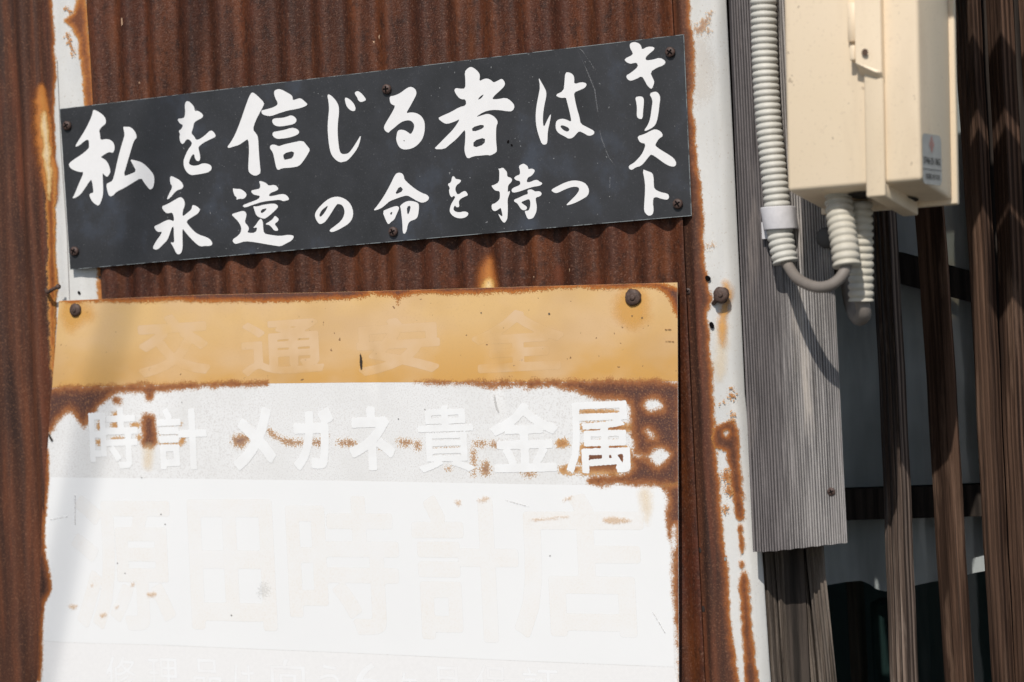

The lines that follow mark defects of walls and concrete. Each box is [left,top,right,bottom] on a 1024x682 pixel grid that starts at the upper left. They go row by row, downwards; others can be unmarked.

corrosion [0,0,760,682]